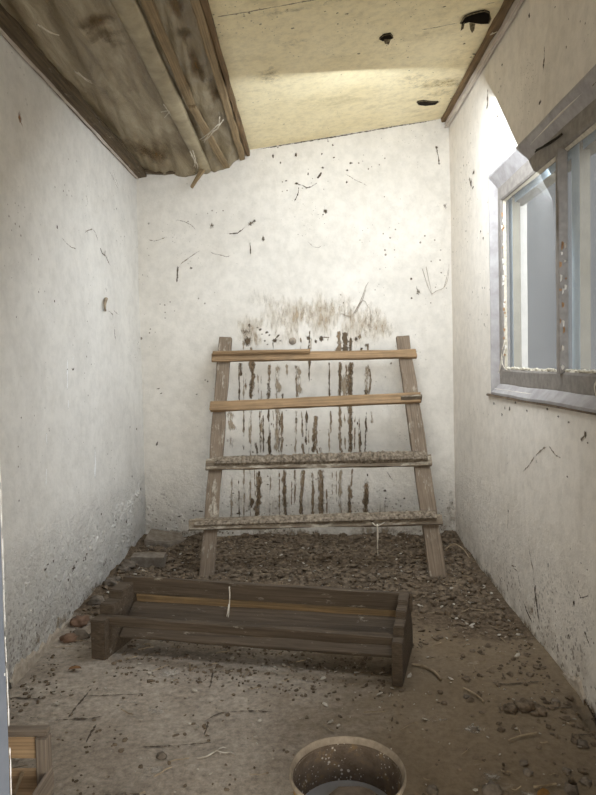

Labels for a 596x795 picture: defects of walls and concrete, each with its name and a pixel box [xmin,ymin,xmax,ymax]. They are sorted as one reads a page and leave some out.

crack [218,0,313,17]
water stain [241,324,281,350]
water stain [300,304,369,351]
water stain [238,361,311,400]
water stain [328,362,354,396]
water stain [364,366,372,395]
water stain [227,409,284,456]
water stain [294,406,373,454]
water stain [230,469,369,517]